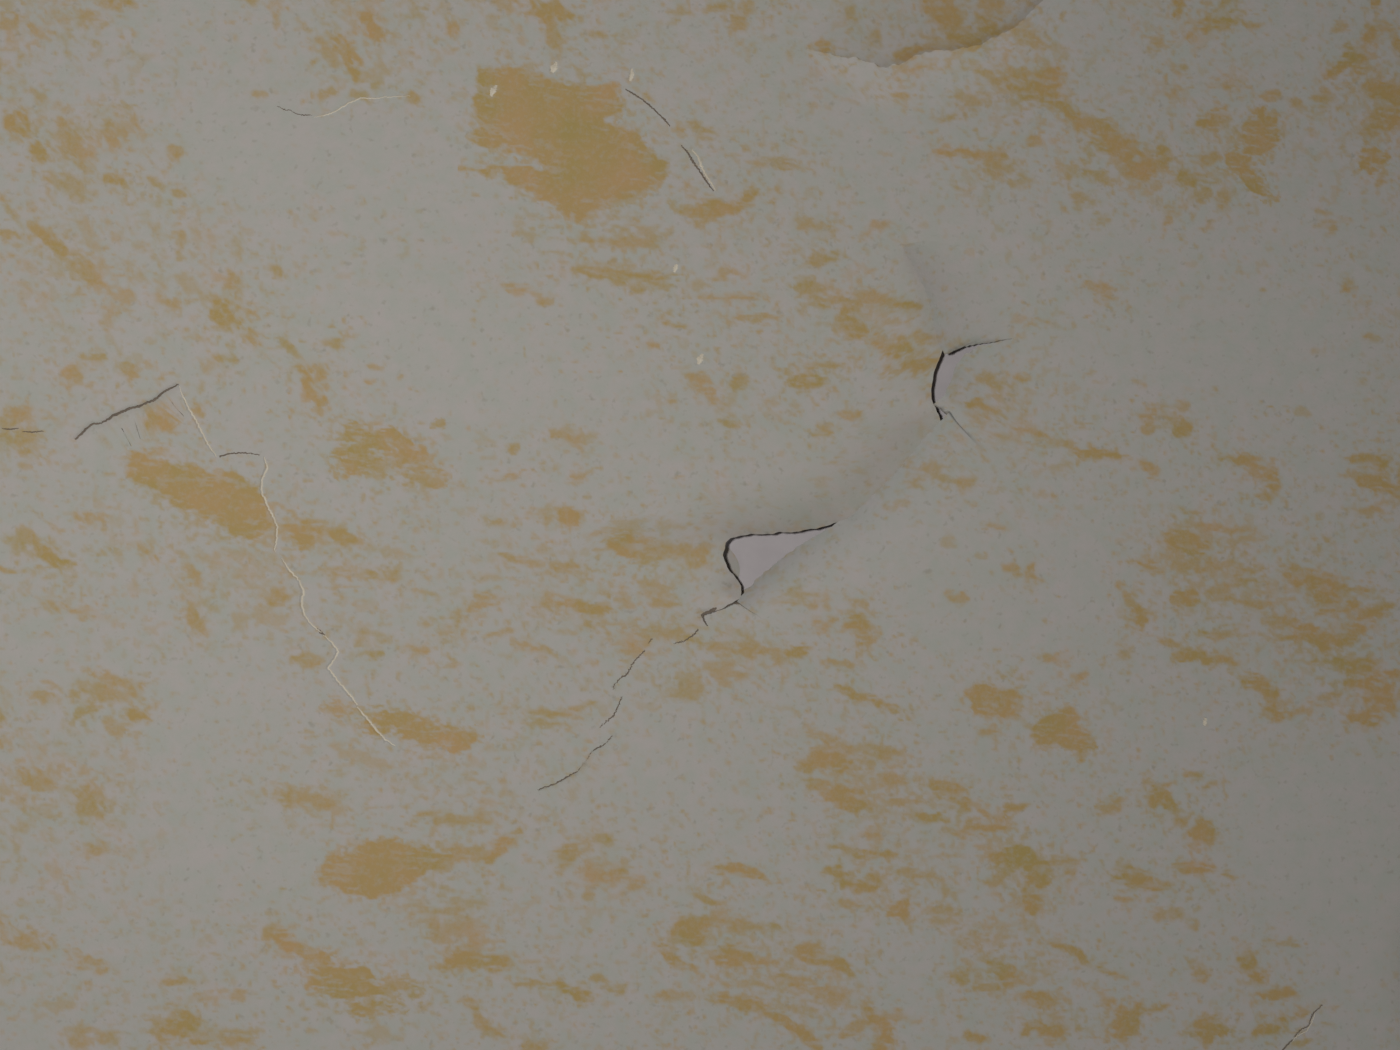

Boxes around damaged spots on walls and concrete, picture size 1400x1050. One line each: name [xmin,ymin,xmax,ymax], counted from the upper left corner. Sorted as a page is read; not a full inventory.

crack [75,384,395,747]
crack [539,629,699,803]
peeling [655,241,1026,626]